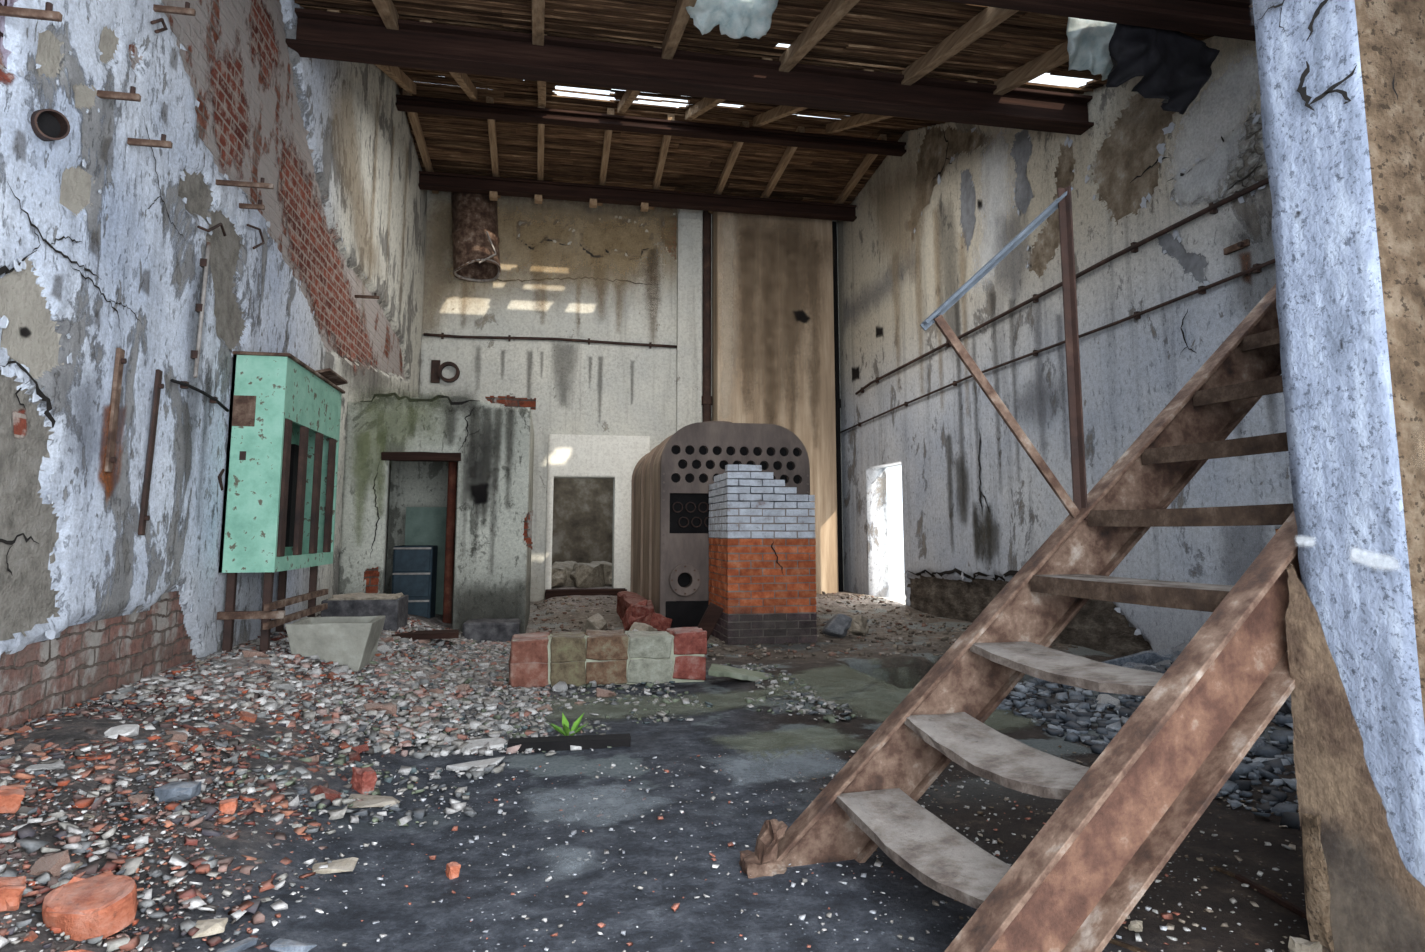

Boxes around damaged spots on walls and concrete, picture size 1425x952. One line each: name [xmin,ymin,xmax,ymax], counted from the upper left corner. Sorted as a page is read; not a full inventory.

flaking render [0,0,105,114]
crack [1258,0,1357,111]
crack [0,182,142,336]
flaking render [162,0,405,380]
flaking render [907,126,993,253]
leakage [982,140,1008,277]
flaking render [1026,93,1176,279]
leakage [1175,59,1258,202]
flaking render [0,255,197,728]
leakage [360,391,514,514]
leakage [947,437,997,559]
leakage [459,587,524,634]